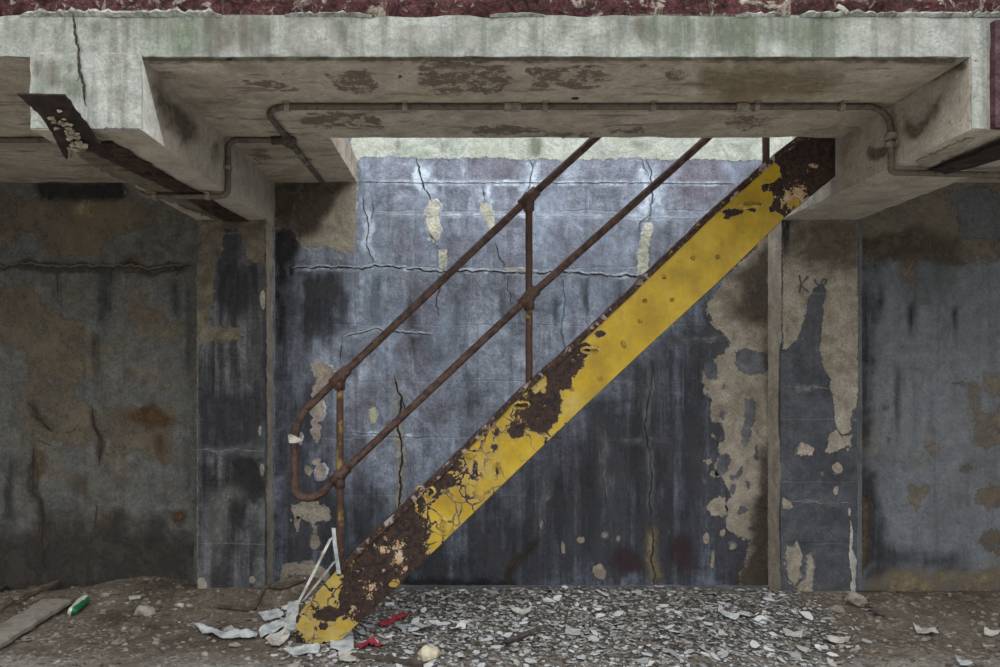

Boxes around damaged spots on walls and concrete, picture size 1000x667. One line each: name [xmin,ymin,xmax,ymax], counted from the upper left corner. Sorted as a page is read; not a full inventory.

crack [72,15,87,107]
leakage [326,68,378,94]
leakage [417,61,512,96]
leakage [525,65,606,92]
crack [0,259,192,304]
peeling [423,198,448,269]
crack [292,157,731,363]
peeling [636,222,654,275]
peeling [66,147,365,589]
leakage [200,182,387,578]
peeling [701,183,1000,592]
crack [346,373,429,508]